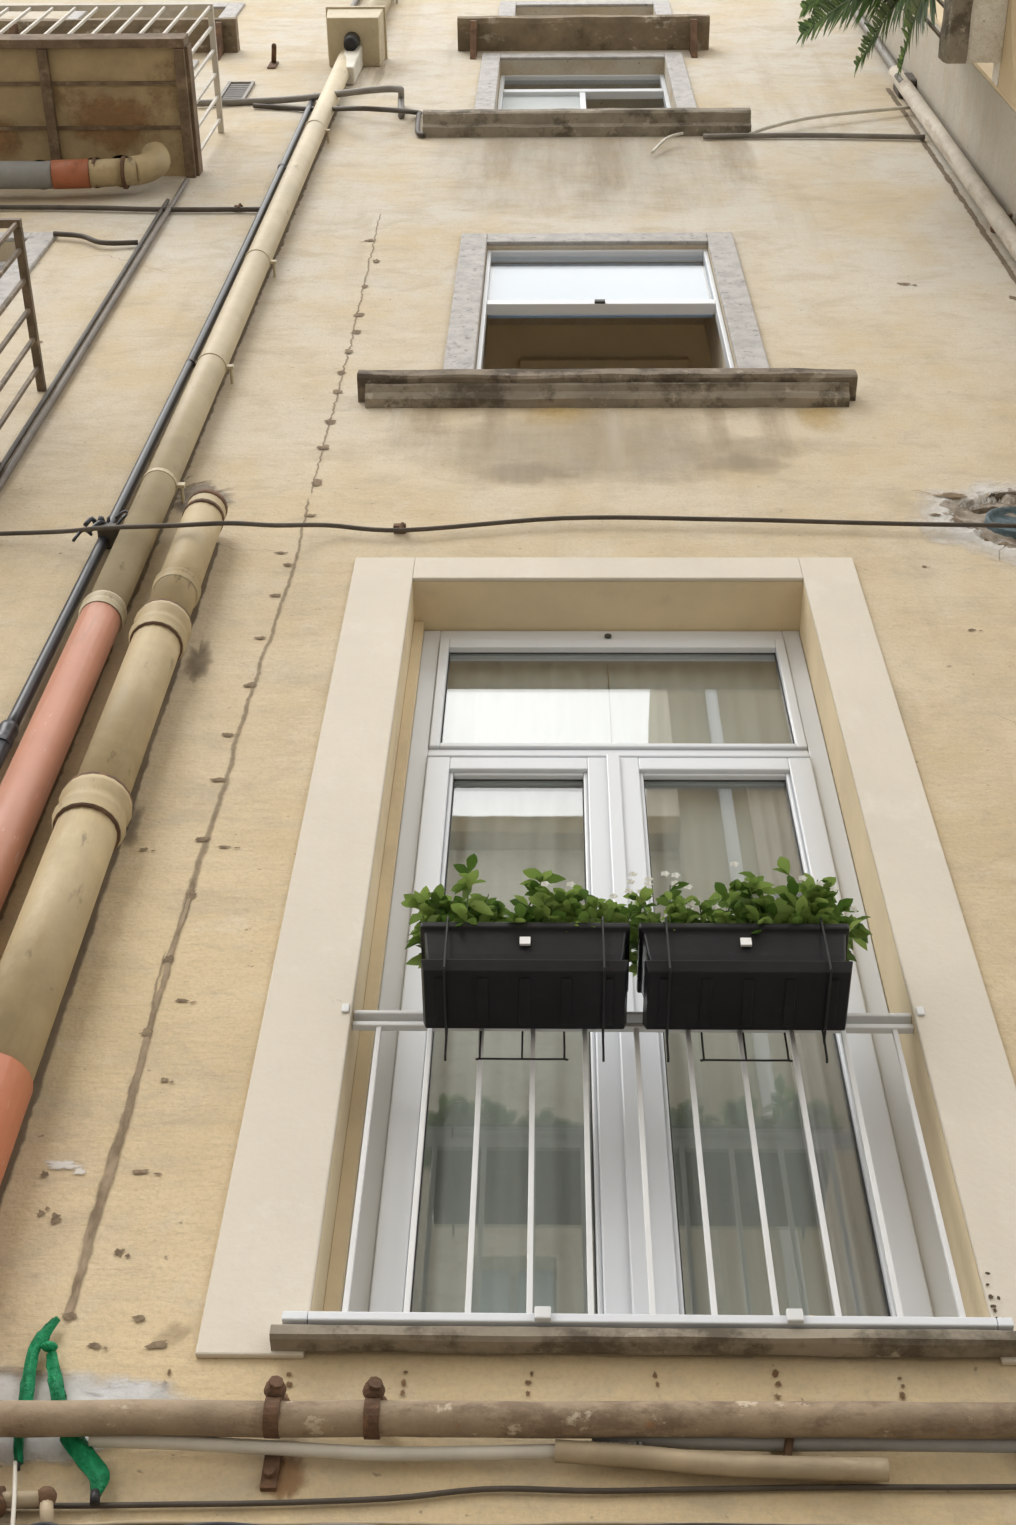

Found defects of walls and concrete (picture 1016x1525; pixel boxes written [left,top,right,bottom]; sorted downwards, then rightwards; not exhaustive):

spalling [914,483,1016,562]
peeling [87,1379,163,1398]